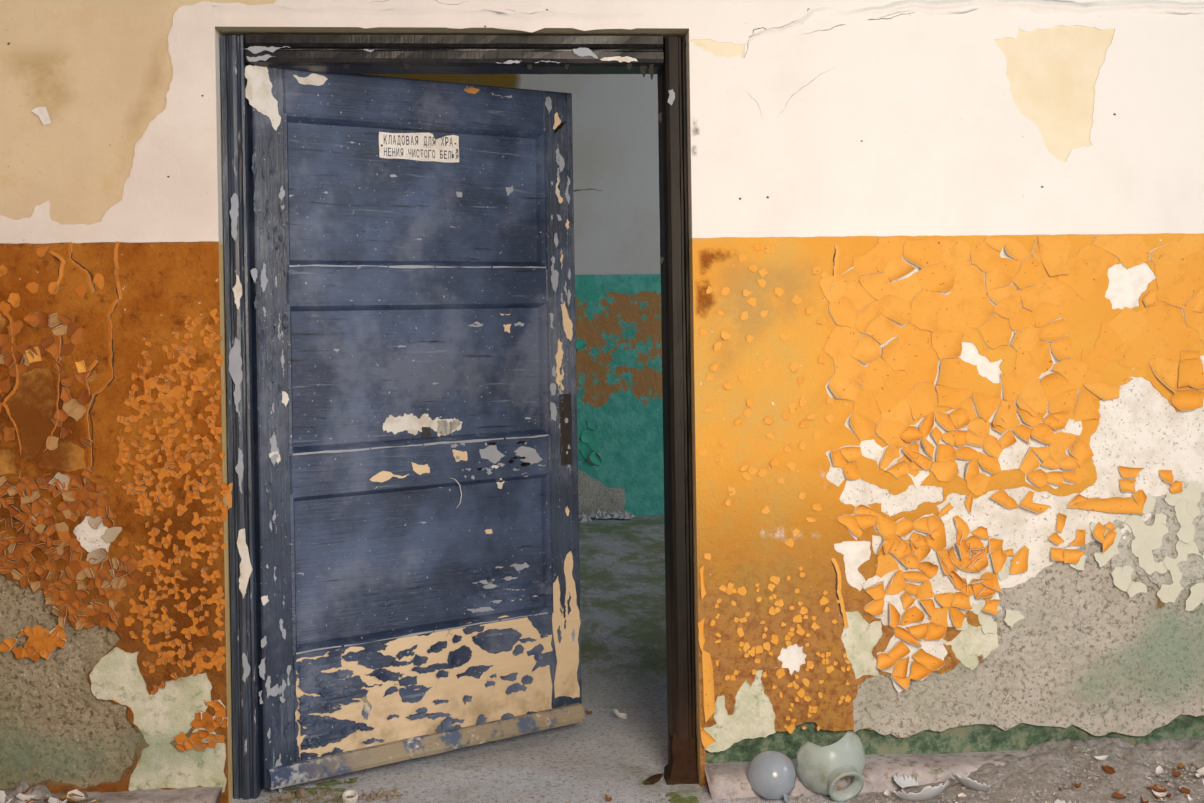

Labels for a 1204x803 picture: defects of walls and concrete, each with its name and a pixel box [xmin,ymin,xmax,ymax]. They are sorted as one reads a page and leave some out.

peeling [0,0,276,225]
peeling [245,46,291,131]
peeling [294,73,328,86]
peeling [365,47,654,98]
peeling [545,96,566,133]
peeling [995,25,1115,163]
peeling [229,146,294,250]
spalling [382,148,626,516]
spalling [0,263,592,792]
spalling [698,234,1204,752]